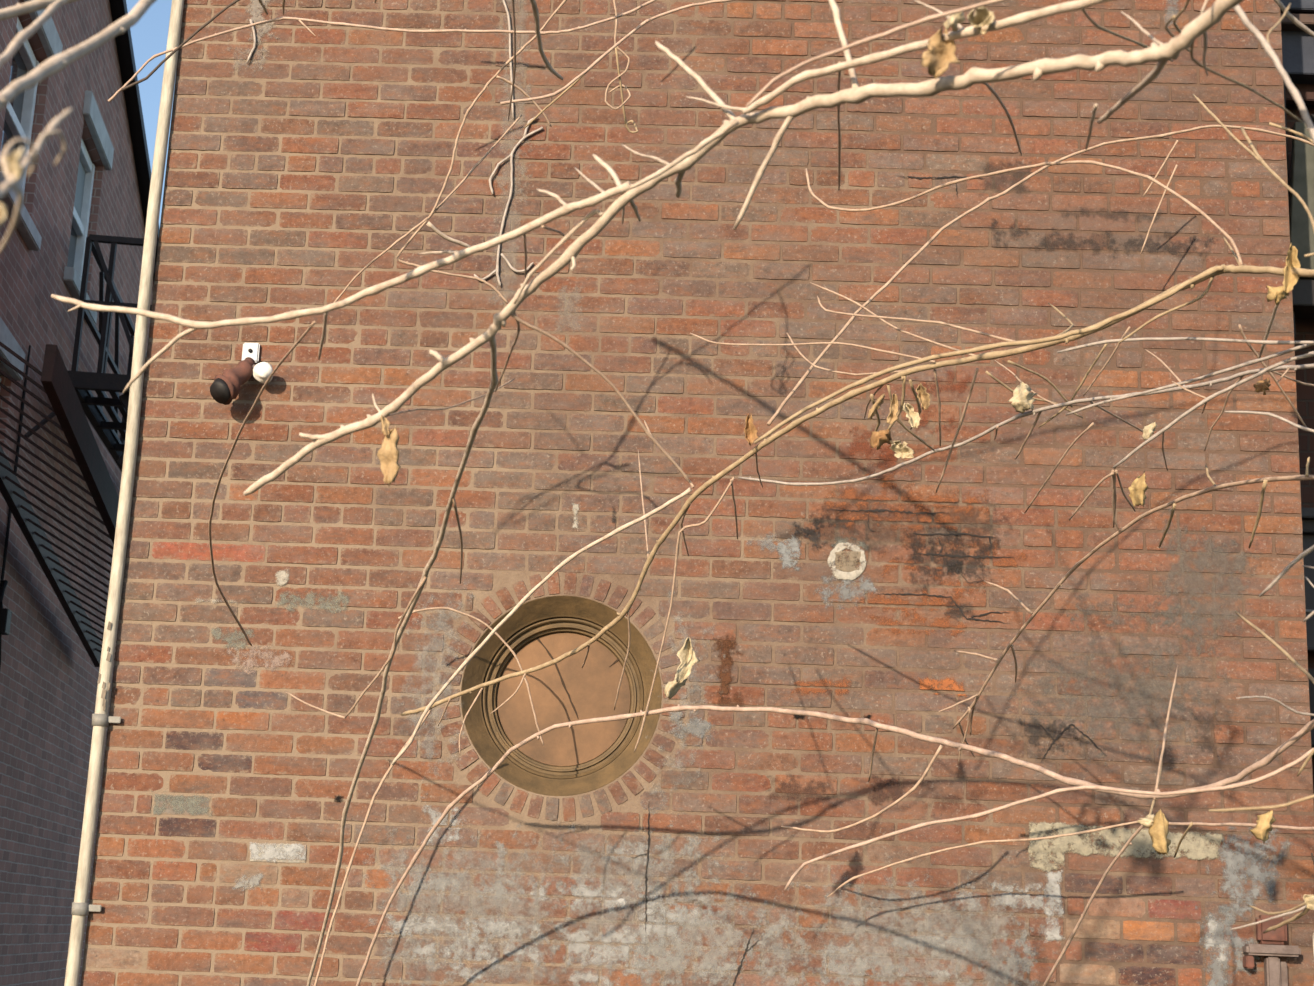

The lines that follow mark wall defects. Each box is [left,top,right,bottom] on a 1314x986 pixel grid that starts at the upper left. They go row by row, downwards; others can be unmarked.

water stain [1041,232,1213,254]
corrosion [716,637,741,695]
spalling [791,678,850,695]
spalling [919,678,966,697]
water stain [424,805,459,843]
crack [631,806,650,932]
water stain [388,836,1064,986]
water stain [1196,827,1288,986]